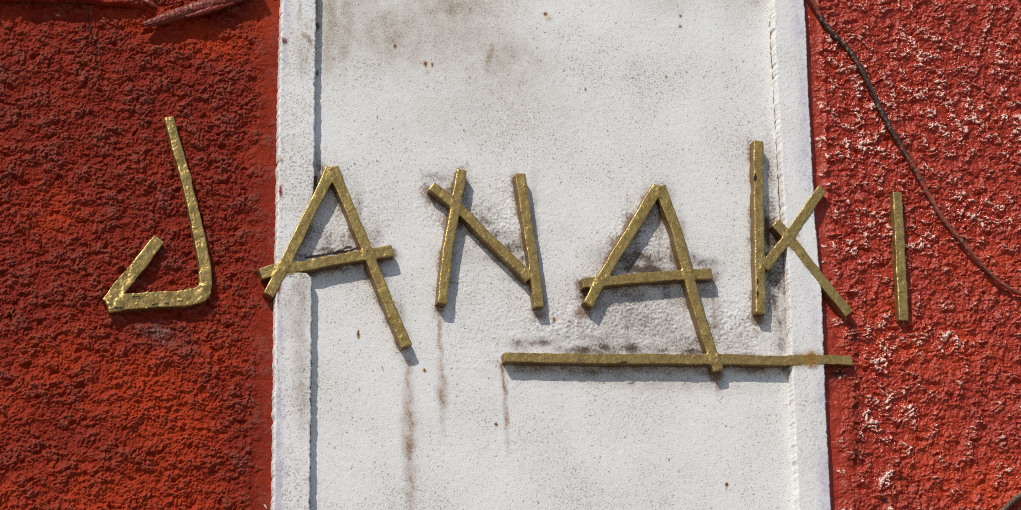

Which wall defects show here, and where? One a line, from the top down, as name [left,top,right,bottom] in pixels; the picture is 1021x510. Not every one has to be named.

corrosion [405,360,415,498]